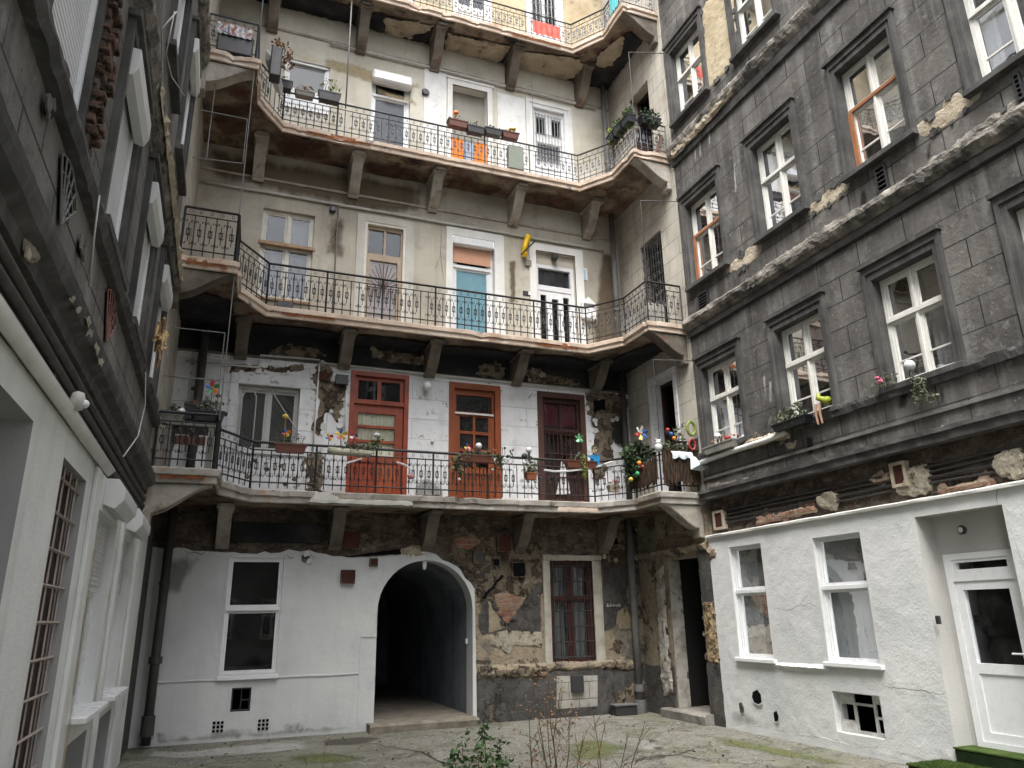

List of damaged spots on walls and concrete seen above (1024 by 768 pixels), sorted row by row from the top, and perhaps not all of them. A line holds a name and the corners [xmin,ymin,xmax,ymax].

peeling [915,91,983,137]
peeling [903,100,1016,193]
peeling [726,174,863,289]
peeling [226,342,346,436]
peeling [531,367,628,484]
peeling [756,502,818,526]
peeling [447,526,542,654]